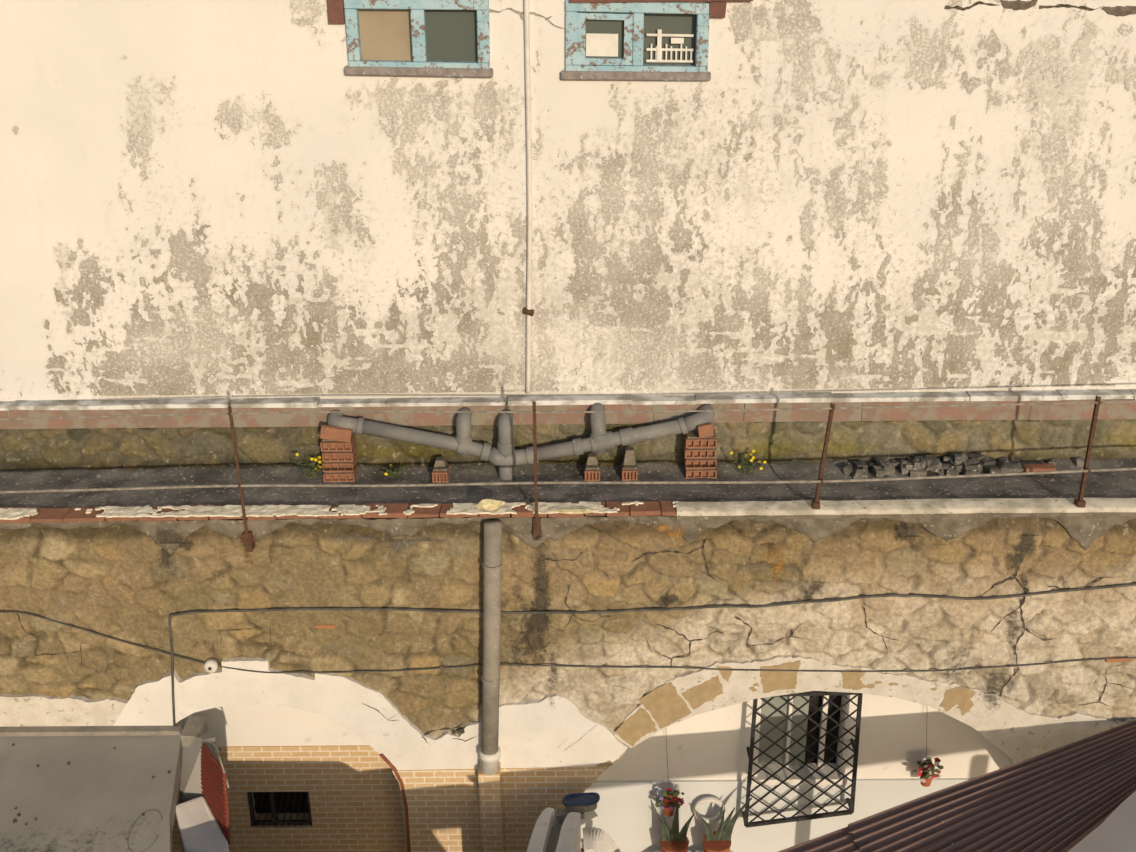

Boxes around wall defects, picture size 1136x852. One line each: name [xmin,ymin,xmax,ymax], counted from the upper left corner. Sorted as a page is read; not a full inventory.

crack [632,538,725,585]
leakage [509,544,550,662]
crack [645,617,808,671]
crack [863,607,896,667]
crack [982,558,1128,697]
crack [1082,664,1132,708]